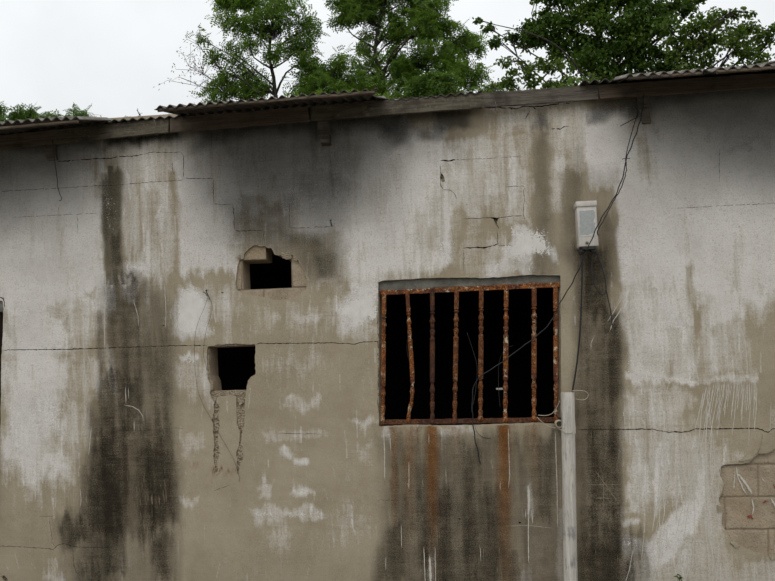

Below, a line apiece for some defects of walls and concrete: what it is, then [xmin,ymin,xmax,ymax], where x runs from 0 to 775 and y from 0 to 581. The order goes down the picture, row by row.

damp [102,166,134,302]
spalling [236,245,307,300]
crack [2,344,204,352]
damp [62,409,174,568]
spalling [207,344,255,473]
damp [576,250,639,581]
crack [578,426,775,434]
spalling [717,433,775,560]